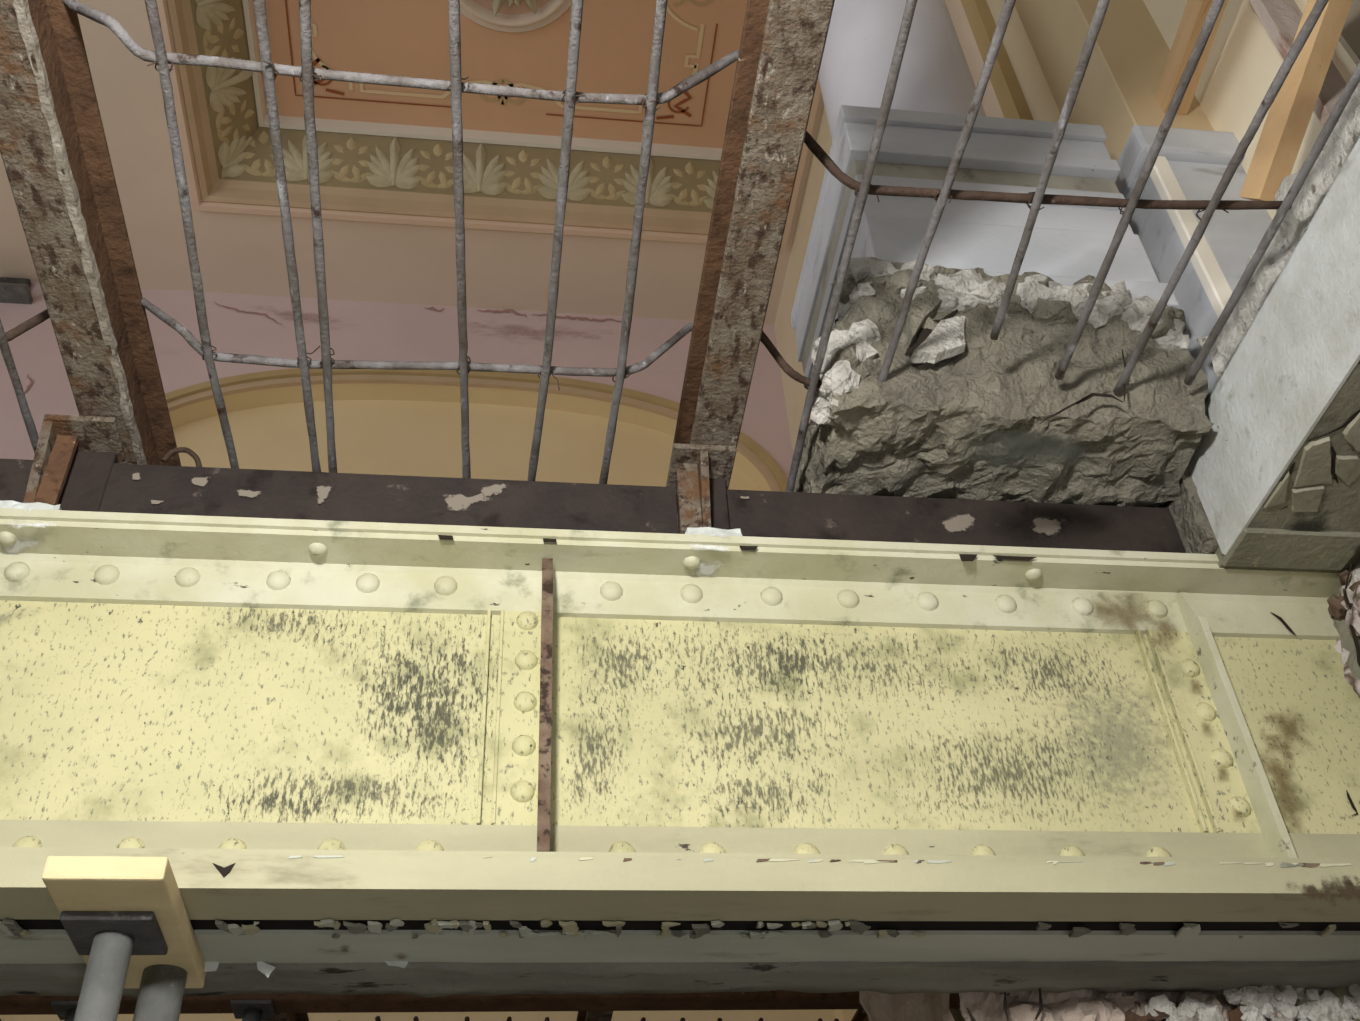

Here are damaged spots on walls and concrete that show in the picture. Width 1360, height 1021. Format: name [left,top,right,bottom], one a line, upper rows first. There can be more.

spalling [810,82,1360,426]
crack [1263,409,1360,511]
mould [207,607,498,823]
corrosion [537,558,553,852]
mould [565,621,1125,823]